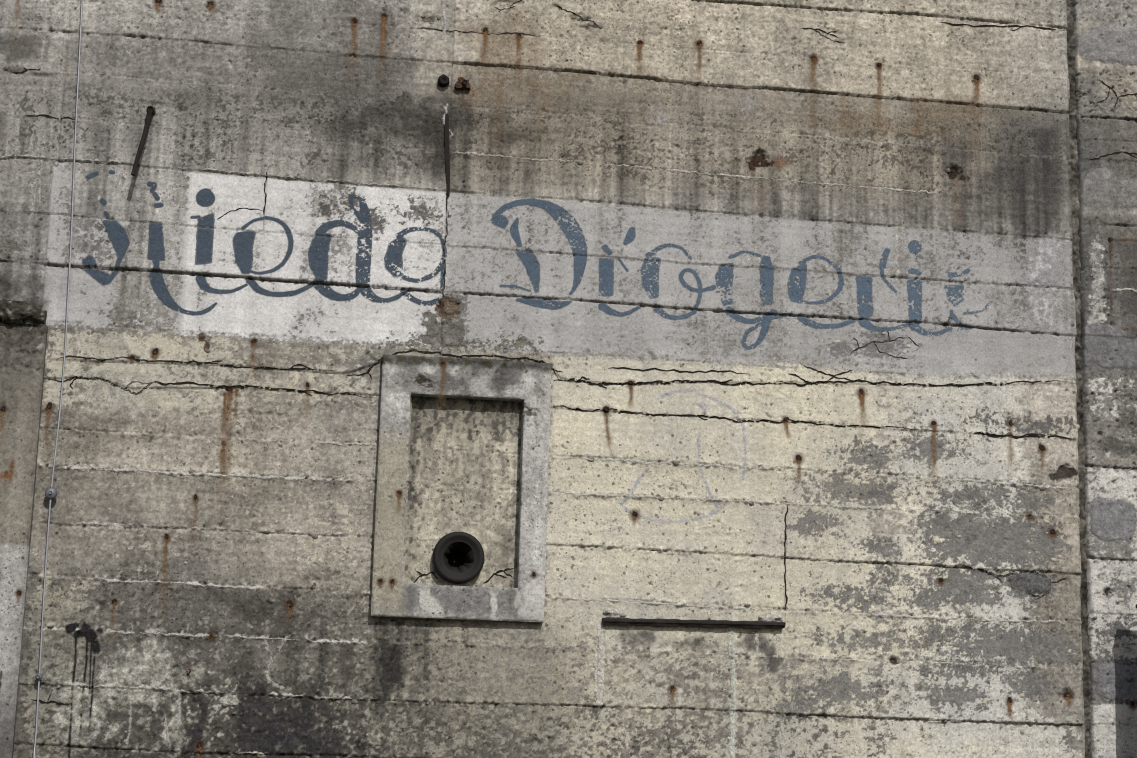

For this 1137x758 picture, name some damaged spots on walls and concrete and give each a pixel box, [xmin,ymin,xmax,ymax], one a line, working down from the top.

leakage [330,101,583,165]
leakage [607,161,931,194]
crack [50,331,1067,430]
corrosion [221,387,238,470]
leakage [47,630,237,758]
leakage [100,578,366,758]
leakage [317,642,403,711]